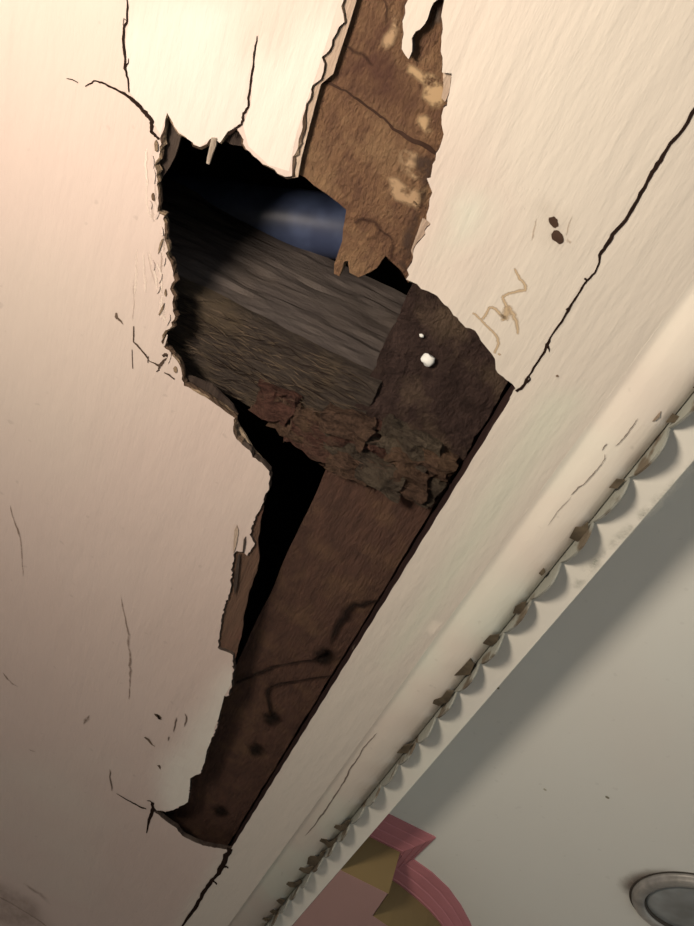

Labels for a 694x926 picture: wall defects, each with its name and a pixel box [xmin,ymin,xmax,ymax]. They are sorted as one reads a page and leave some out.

crack [67,0,159,140]
crack [228,37,257,135]
water stain [243,0,340,171]
peeling [408,66,452,106]
peeling [149,140,177,373]
peeling [389,178,425,207]
water stain [355,157,511,274]
crack [515,108,694,392]
crack [132,326,174,379]
peeling [145,656,232,811]
crack [182,847,233,926]
peeling [286,820,351,888]